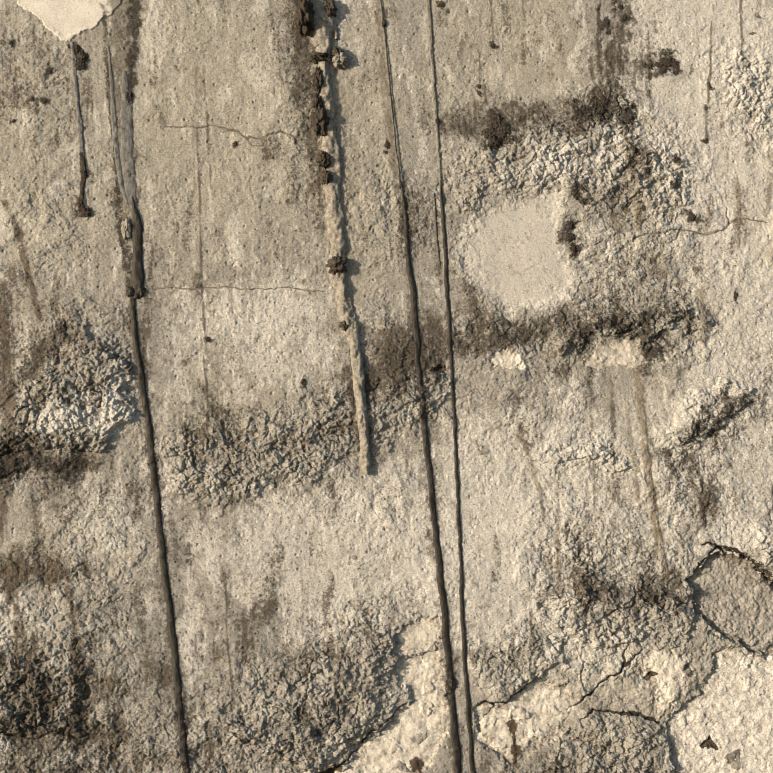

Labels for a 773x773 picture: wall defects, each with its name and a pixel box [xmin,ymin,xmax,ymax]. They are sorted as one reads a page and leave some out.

peeling [17,0,121,42]
mould [482,107,515,151]
peeling [450,186,580,322]
mould [555,213,582,262]
leakage [682,208,703,226]
mould [558,308,694,377]
crack [694,542,773,583]
spalling [334,615,449,773]
crack [479,674,539,716]
crack [567,647,660,724]
spalling [636,548,773,773]
rust [506,715,523,768]